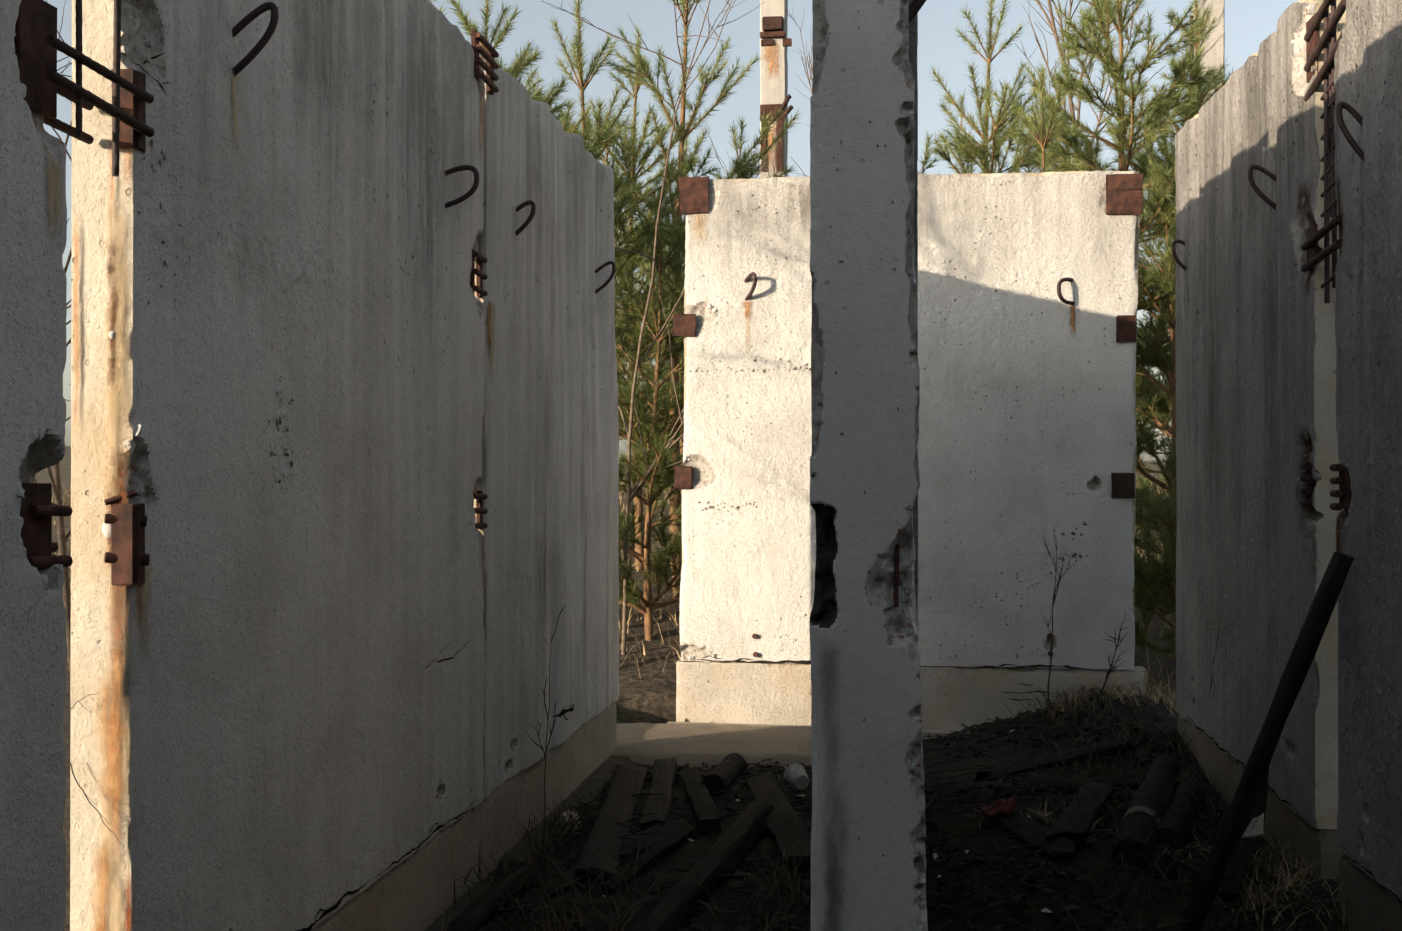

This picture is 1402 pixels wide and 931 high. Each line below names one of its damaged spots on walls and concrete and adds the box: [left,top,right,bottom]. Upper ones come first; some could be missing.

spalling [14,33,66,165]
spalling [121,0,166,90]
corrosion [105,145,130,514]
spalling [687,273,837,457]
spalling [865,0,920,679]
spalling [17,420,65,498]
spalling [683,454,757,512]
spalling [809,504,838,628]
crack [423,641,470,671]
corrosion [94,584,131,931]
spalling [904,705,926,908]